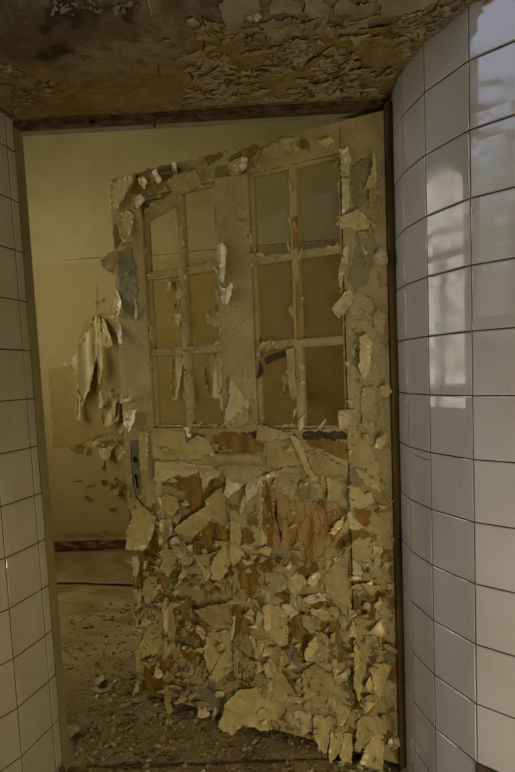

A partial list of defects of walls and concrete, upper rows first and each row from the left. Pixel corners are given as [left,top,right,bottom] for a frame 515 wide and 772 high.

peeling [18,0,471,128]
peeling [204,144,263,176]
peeling [363,153,377,190]
peeling [100,164,201,274]
peeling [338,209,371,231]
peeling [369,246,388,266]
flaking render [48,297,126,469]
peeling [379,383,392,398]
flaking render [64,215,380,718]
peeling [218,659,298,736]
peeling [313,640,393,771]
peeling [474,764,497,772]